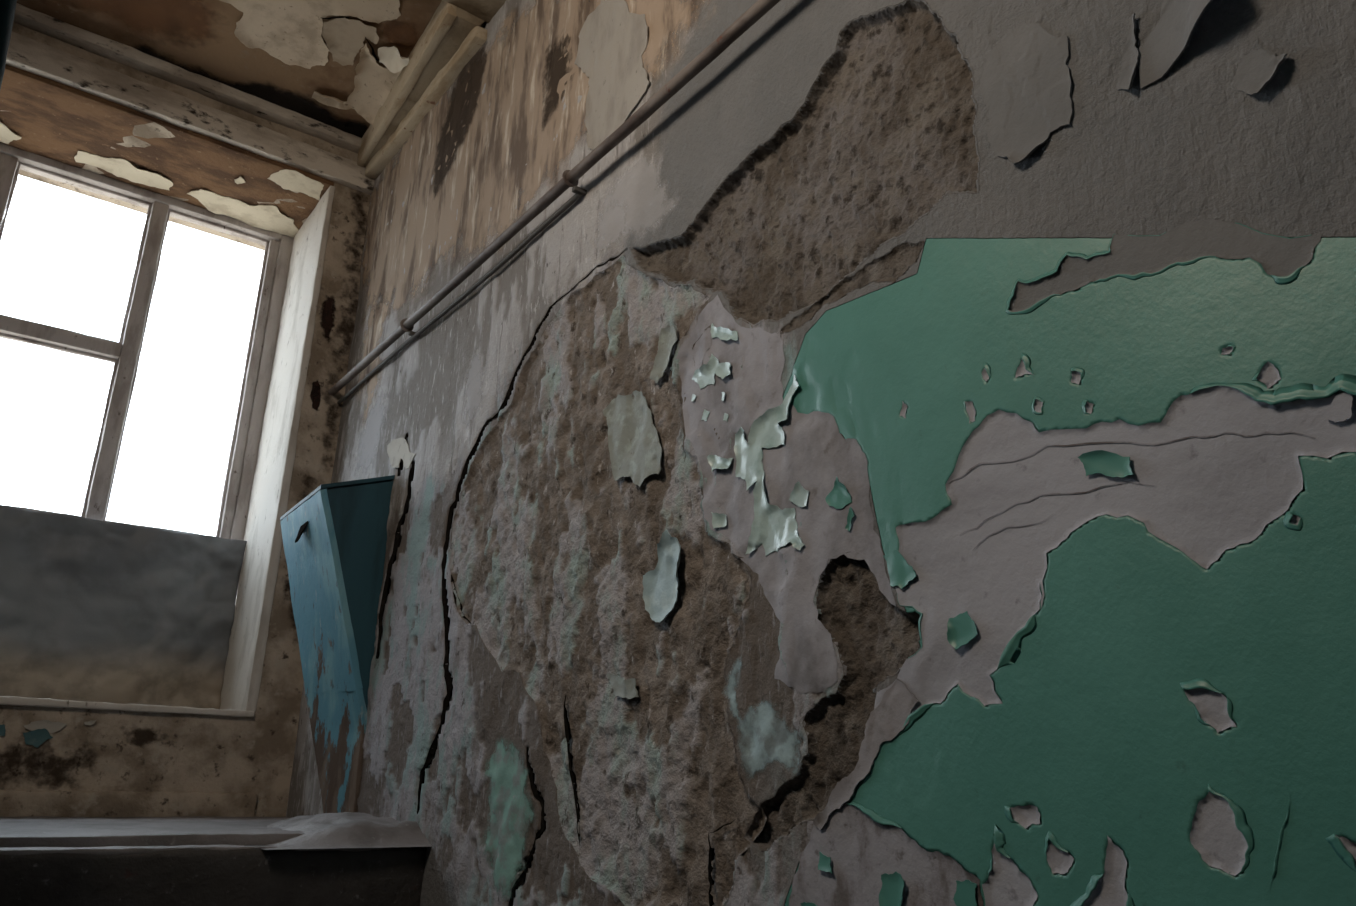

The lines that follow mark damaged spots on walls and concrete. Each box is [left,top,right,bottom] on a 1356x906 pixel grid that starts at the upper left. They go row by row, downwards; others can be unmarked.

peeling [220,0,409,126]
peeling [0,122,21,144]
peeling [74,150,173,190]
peeling [187,176,299,238]
peeling [268,169,324,201]
flaking render [449,0,1356,906]
crack [374,433,416,666]
crack [417,250,625,814]
water stain [0,745,93,786]
water stain [131,729,156,746]
crack [508,695,580,906]